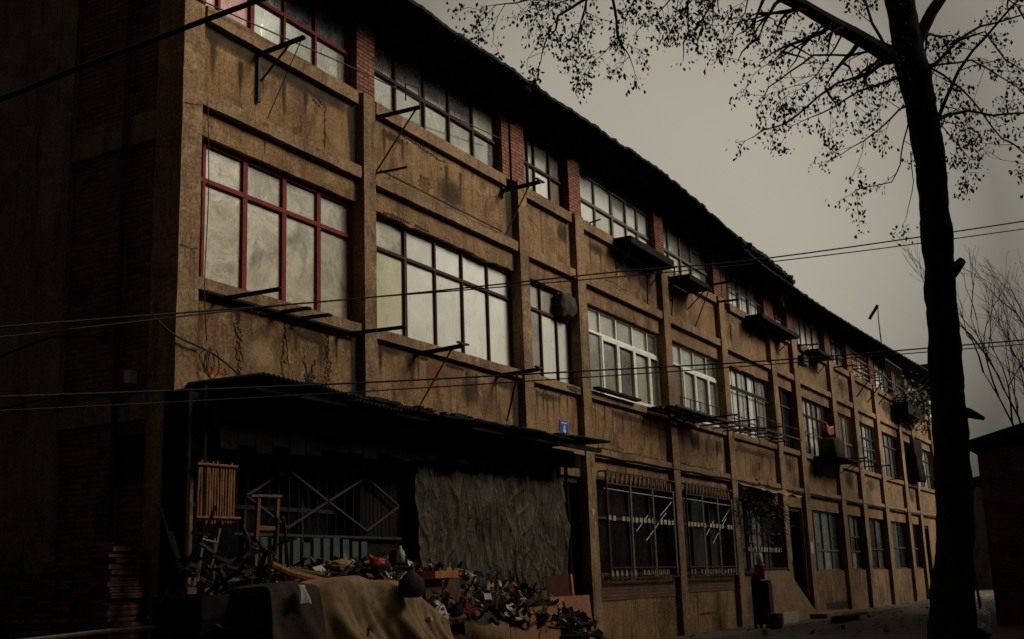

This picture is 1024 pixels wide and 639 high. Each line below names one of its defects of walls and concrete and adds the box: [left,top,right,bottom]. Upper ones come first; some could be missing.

crack [310,91,329,147]
crack [233,304,244,376]
crack [280,318,332,387]